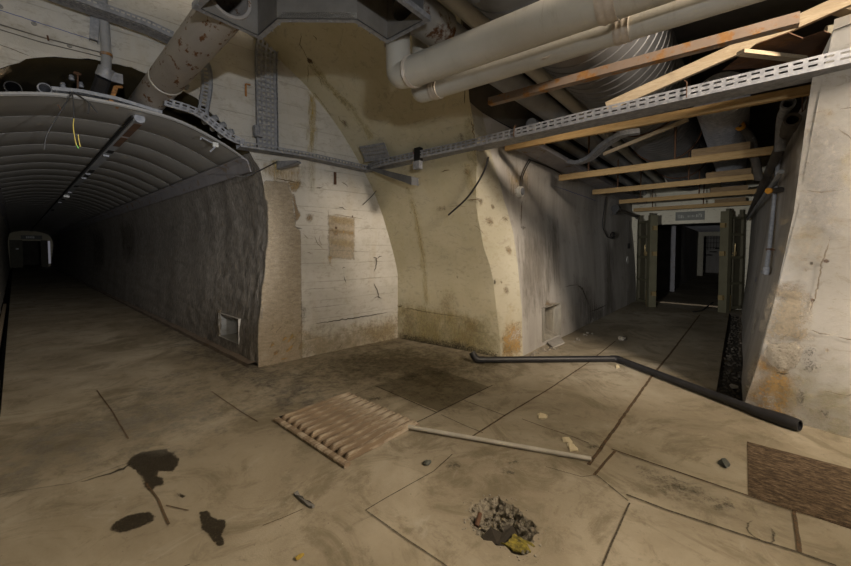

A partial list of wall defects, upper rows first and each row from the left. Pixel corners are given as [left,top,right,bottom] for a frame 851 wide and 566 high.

flaking render [258,180,303,368]
crack [810,240,830,310]
water stain [315,326,522,400]
water stain [752,361,804,414]
water stain [82,449,179,490]
water stain [110,511,154,532]
water stain [199,511,226,546]
spalling [459,494,549,563]